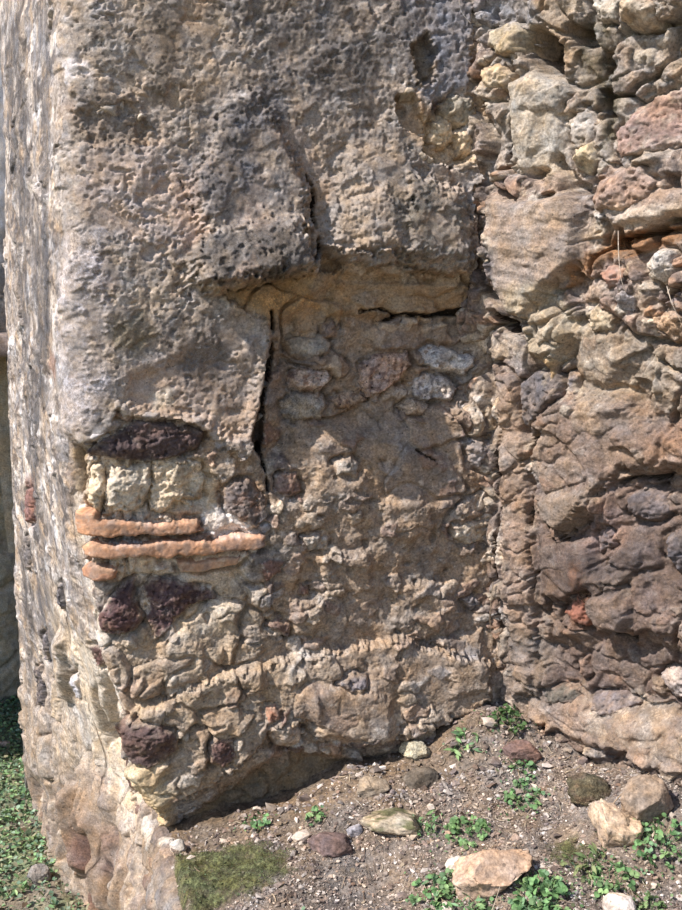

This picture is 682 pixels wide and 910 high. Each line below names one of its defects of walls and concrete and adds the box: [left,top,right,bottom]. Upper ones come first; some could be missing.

crack [363,307,462,321]
crack [495,312,526,340]
crack [251,311,273,492]
crack [491,432,503,581]
crack [494,603,506,642]